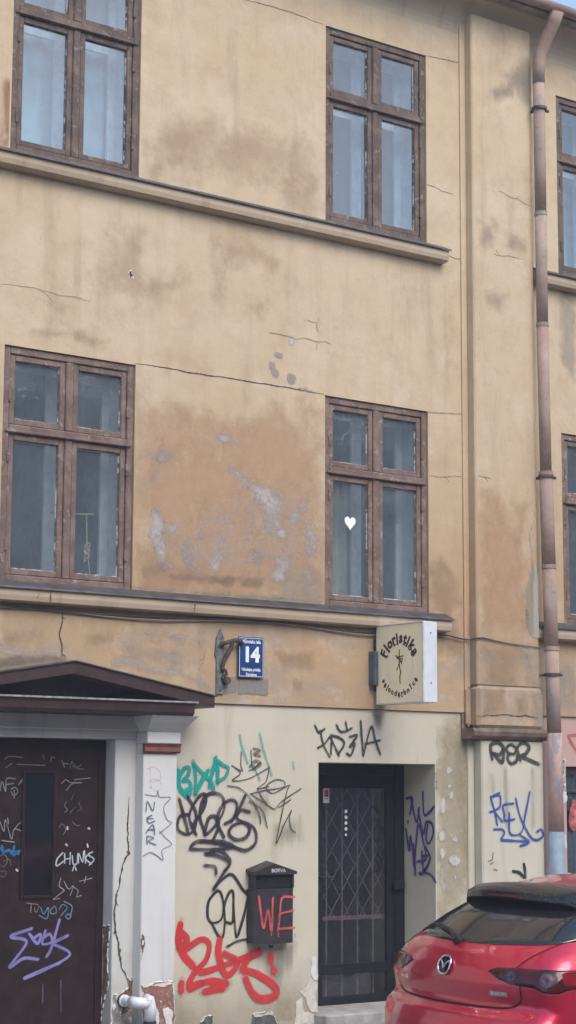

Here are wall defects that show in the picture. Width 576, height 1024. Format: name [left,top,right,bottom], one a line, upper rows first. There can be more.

peeling [270,338,312,392]
peeling [229,468,304,539]
peeling [149,511,198,574]
crack [37,593,65,657]
peeling [434,761,453,813]
crack [114,801,130,979]
peeling [439,832,460,891]
flaking render [100,924,176,1024]